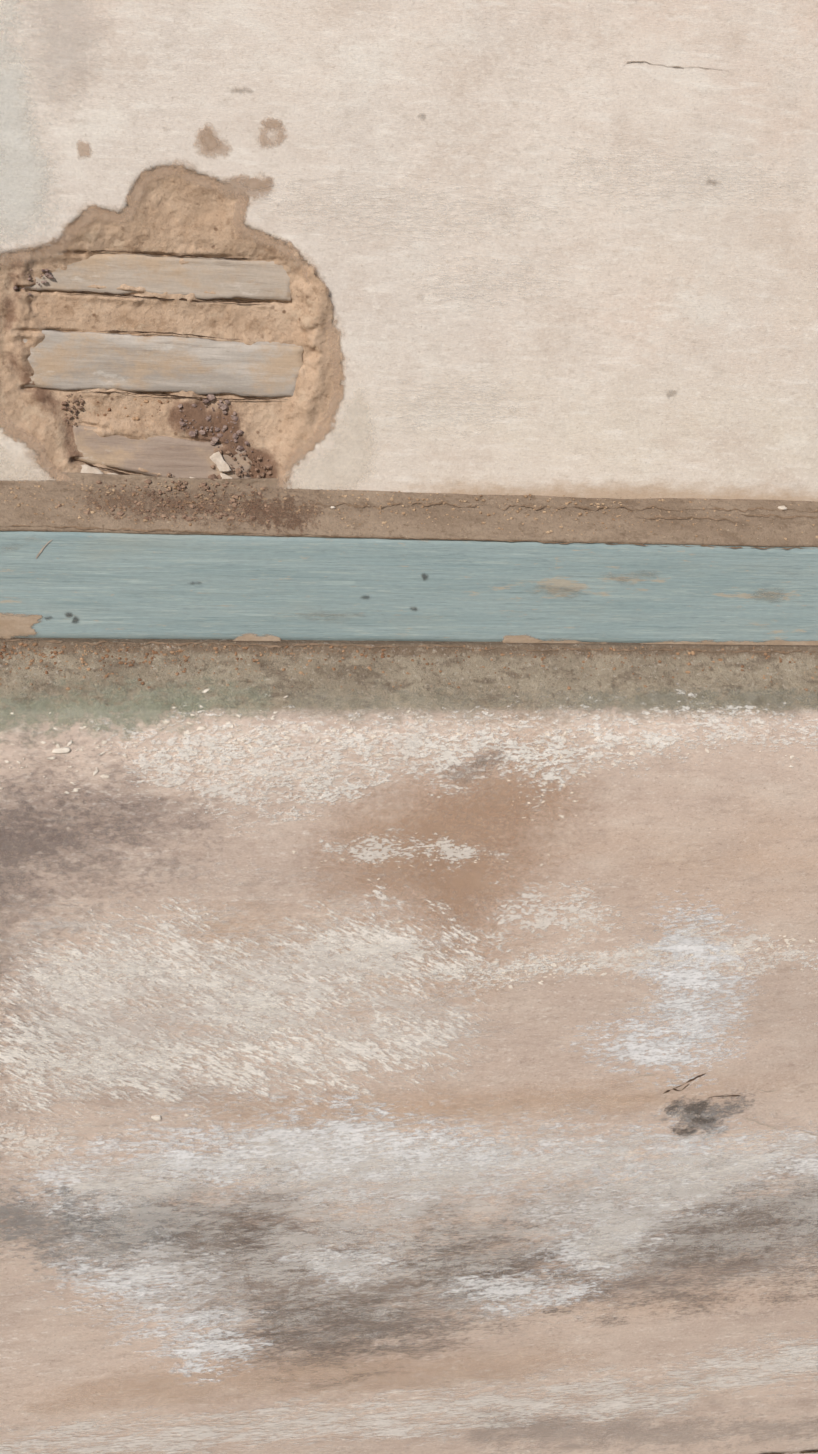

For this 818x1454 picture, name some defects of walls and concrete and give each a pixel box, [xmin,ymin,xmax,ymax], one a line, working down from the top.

peeling [78,142,90,156]
peeling [195,126,228,155]
spalling [0,165,344,488]
peeling [0,613,42,639]
water stain [59,1149,818,1384]
crack [767,1446,818,1454]